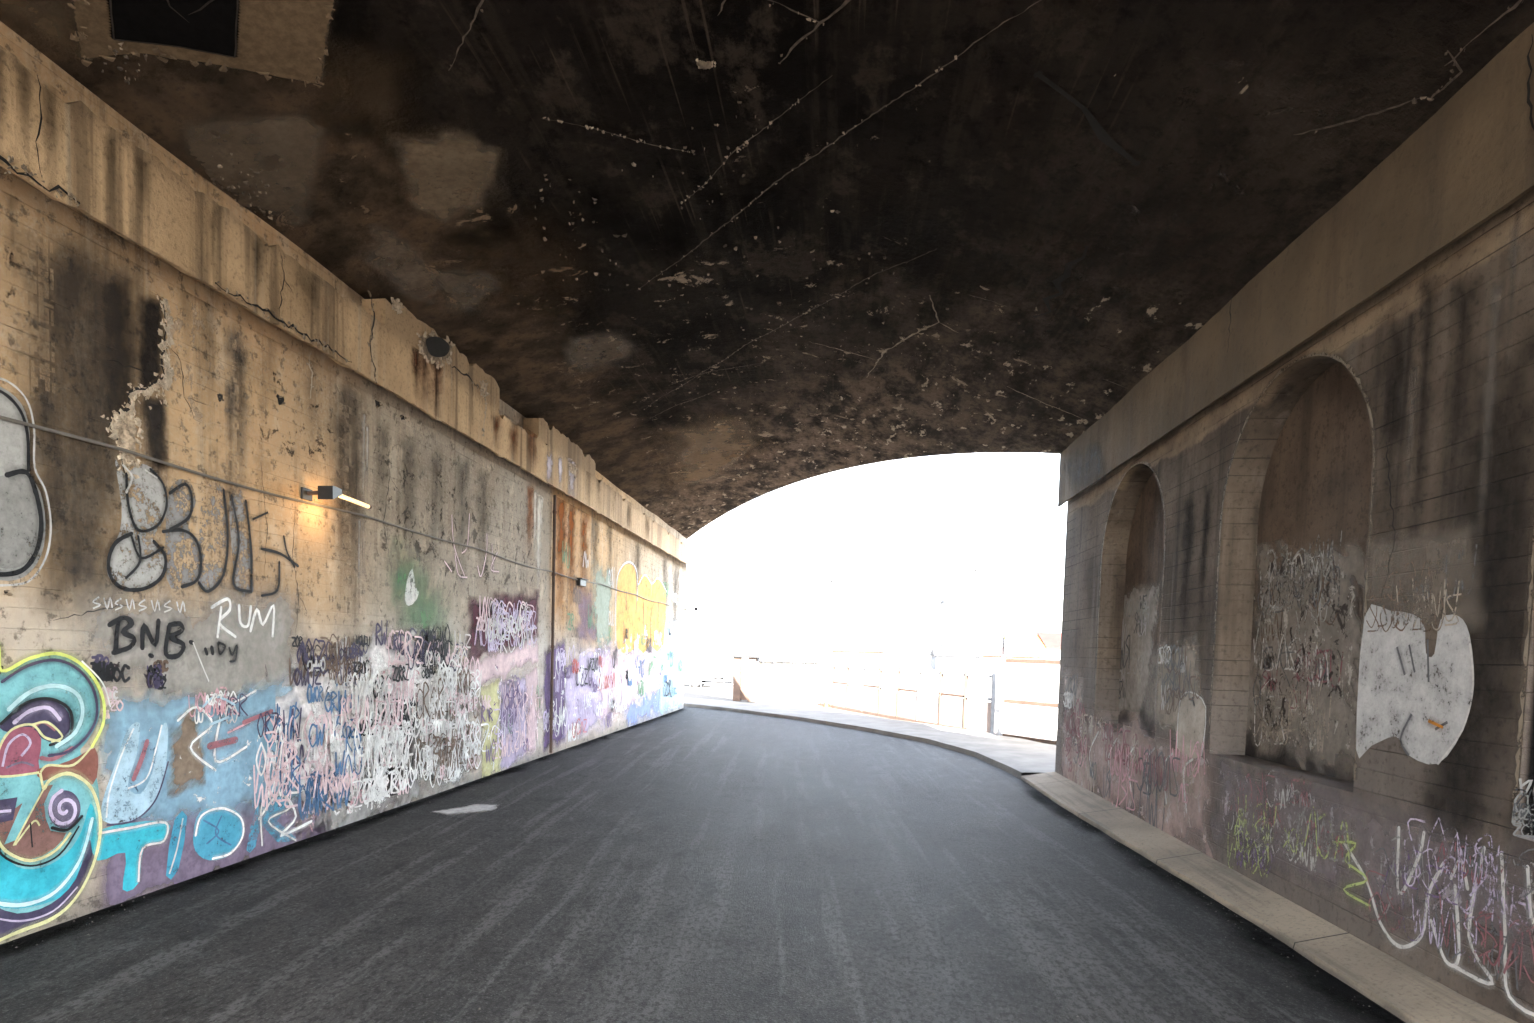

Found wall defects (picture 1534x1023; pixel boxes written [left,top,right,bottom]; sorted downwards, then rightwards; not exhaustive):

crack [448,0,484,71]
crack [541,79,828,204]
crack [638,0,1041,290]
damp [28,247,166,594]